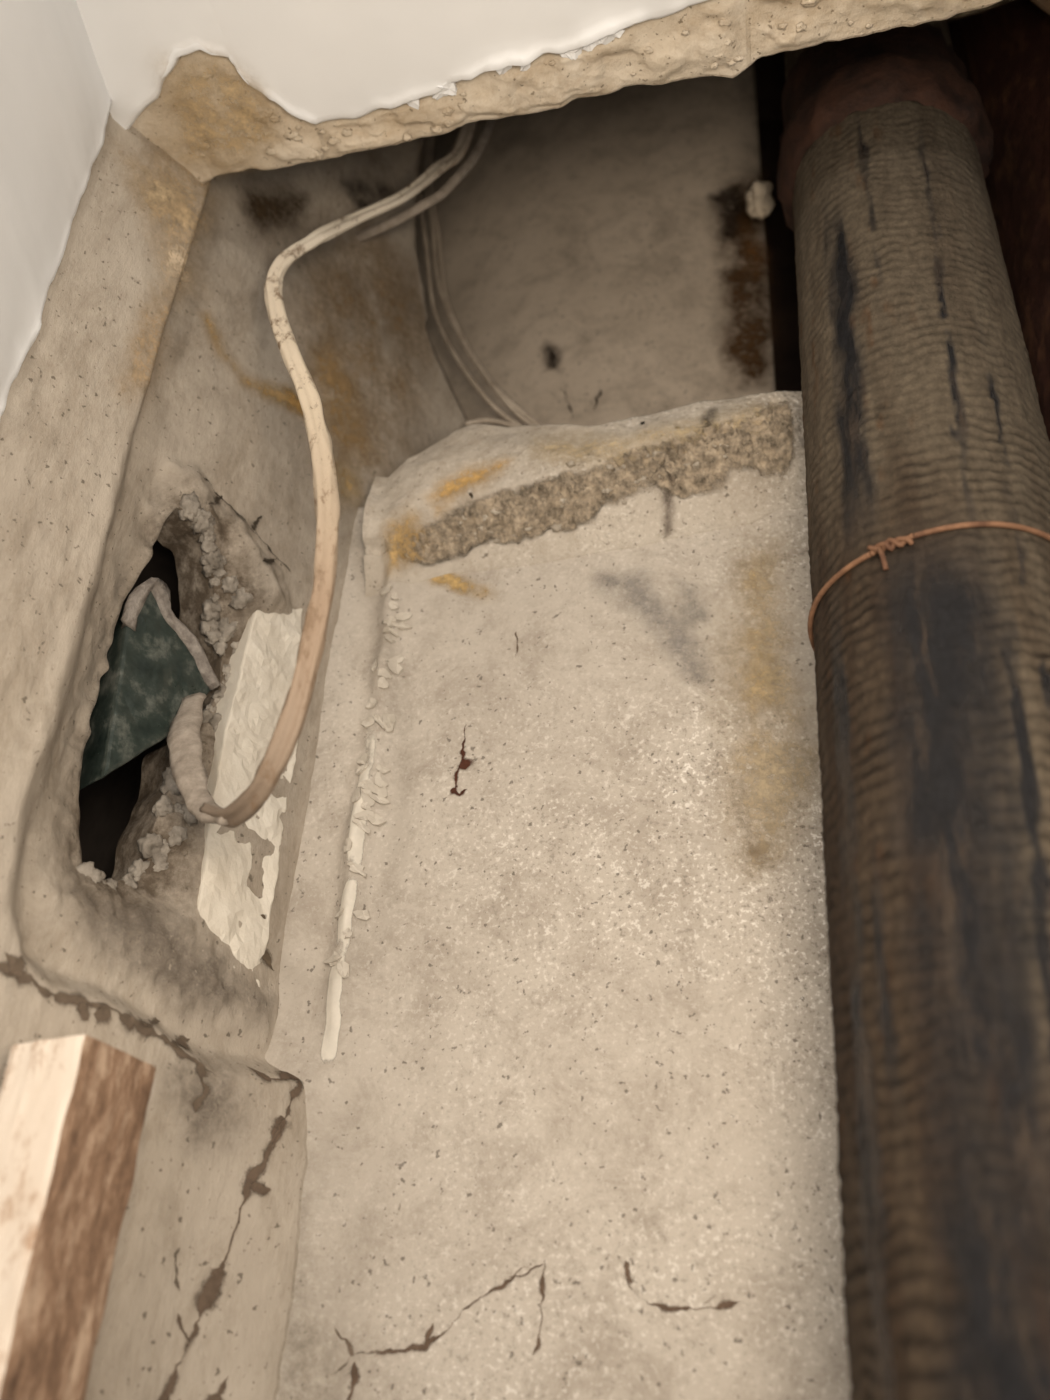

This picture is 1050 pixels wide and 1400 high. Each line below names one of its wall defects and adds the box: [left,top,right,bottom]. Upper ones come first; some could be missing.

spalling [141,0,1000,285]
spalling [123,540,180,619]
flaking render [178,491,303,808]
spalling [413,401,794,564]
flaking render [76,738,298,987]
crack [0,952,304,1400]
crack [335,1260,546,1400]
crack [622,1261,744,1312]